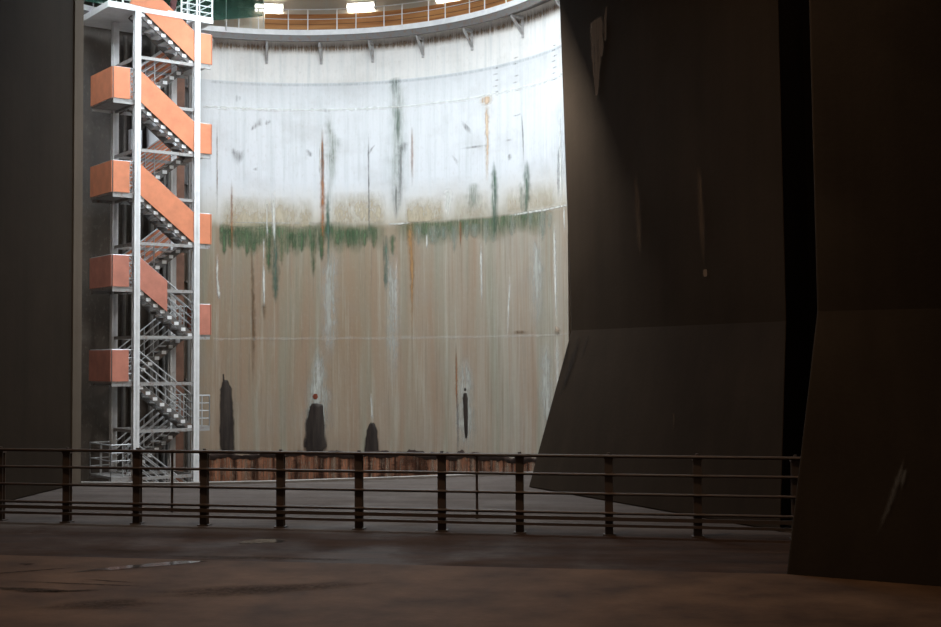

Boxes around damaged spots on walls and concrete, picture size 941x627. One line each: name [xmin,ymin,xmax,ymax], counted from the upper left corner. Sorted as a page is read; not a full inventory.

leakage [226,203,309,237]
leakage [394,194,449,224]
leakage [220,374,234,451]
leakage [304,359,327,451]
leakage [364,403,378,452]
leakage [459,367,472,440]